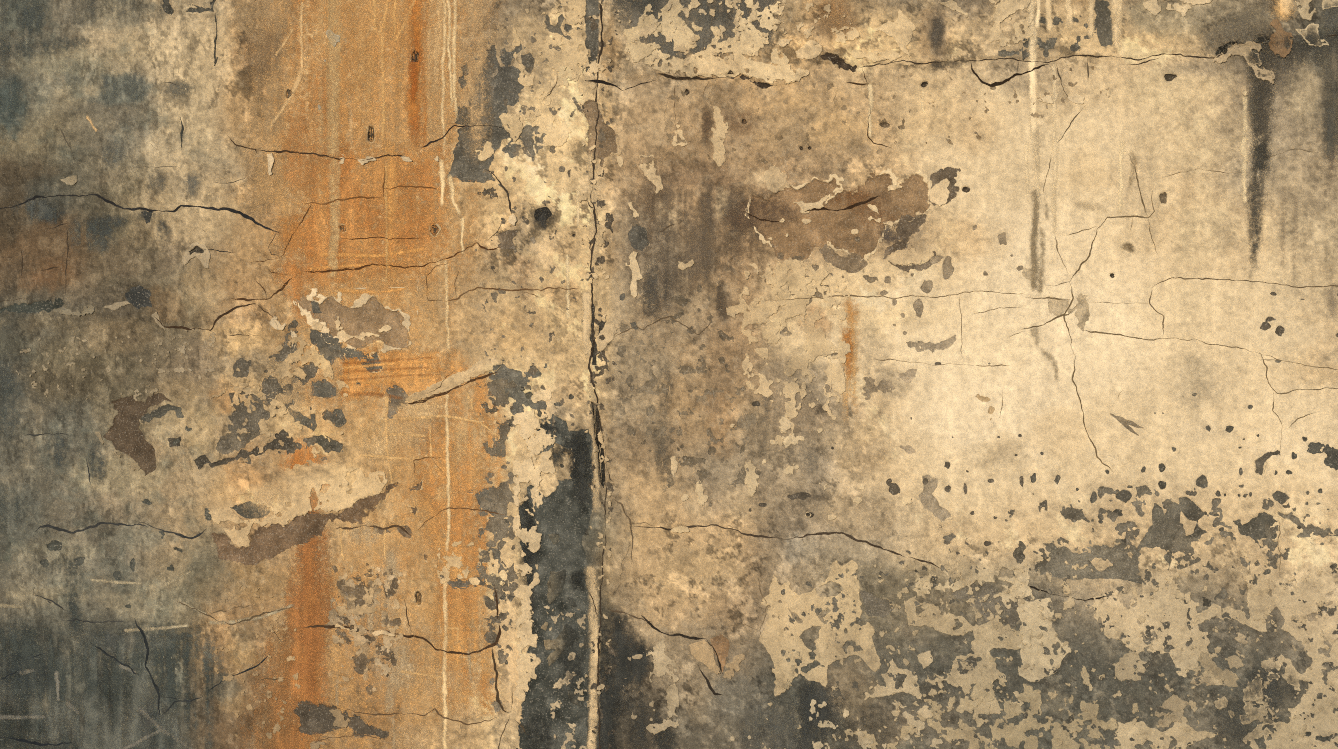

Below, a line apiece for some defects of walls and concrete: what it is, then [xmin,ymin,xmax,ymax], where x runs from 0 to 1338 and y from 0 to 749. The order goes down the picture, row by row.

peeling [989,0,1114,61]
crack [847,39,1268,192]
damp [1205,4,1338,253]
corrosion [1275,0,1293,18]
peeling [194,288,424,565]
corrosion [252,0,501,749]
crack [0,0,939,749]
damp [521,496,537,612]
damp [540,379,601,507]
peeling [386,0,963,749]
peeling [759,437,1338,749]
crack [765,154,1338,469]